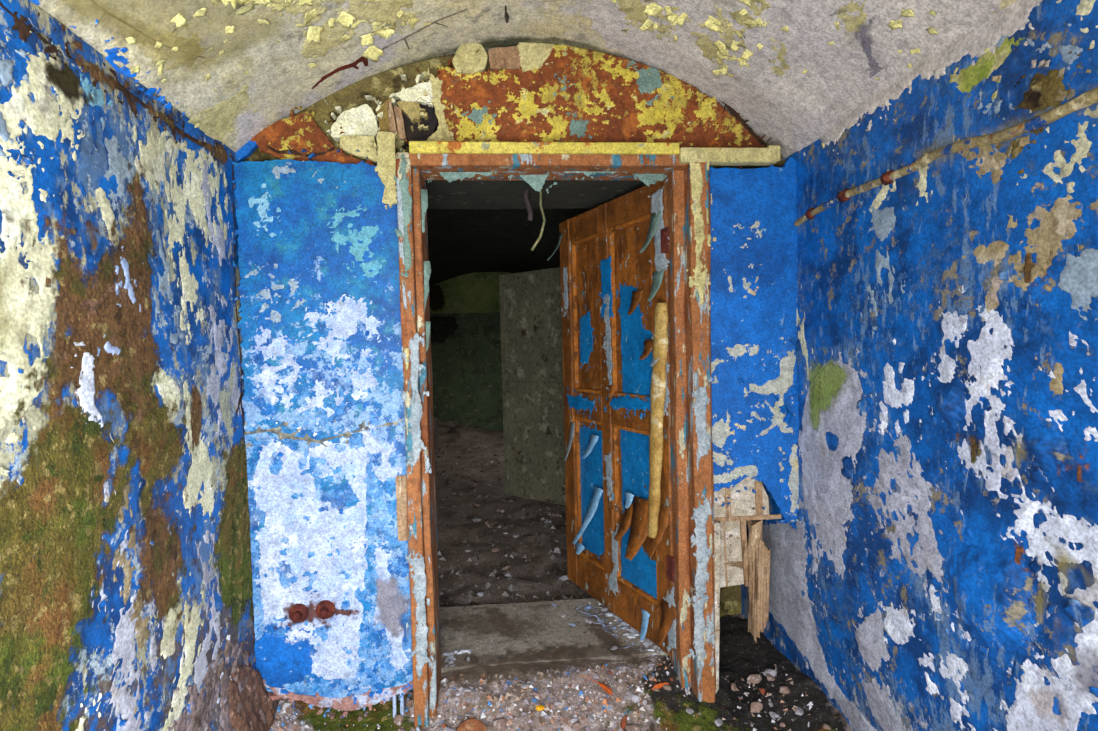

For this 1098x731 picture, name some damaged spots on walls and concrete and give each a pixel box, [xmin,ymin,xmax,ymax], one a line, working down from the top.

damp [0,377,189,731]
peeling [0,0,431,731]
corrosion [274,601,359,628]
peeling [393,0,1098,731]
damp [809,360,848,431]